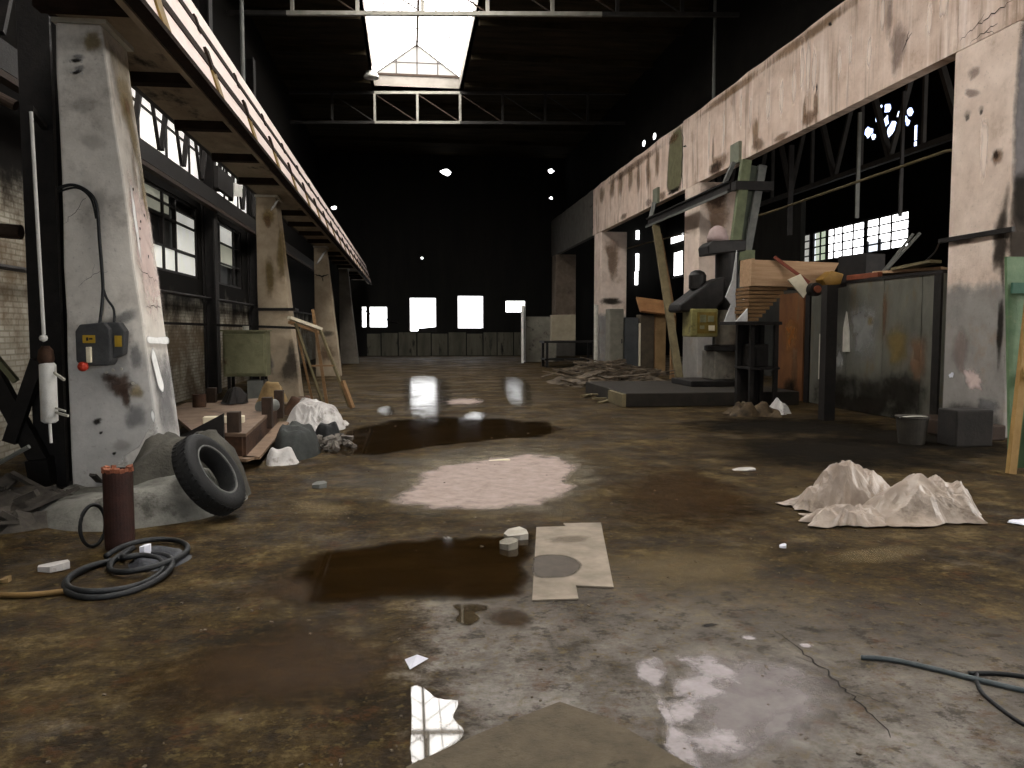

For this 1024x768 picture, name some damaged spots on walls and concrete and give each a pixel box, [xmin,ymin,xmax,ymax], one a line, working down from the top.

leakage [881,0,904,68]
crack [960,1,1010,42]
corrosion [103,368,142,405]
efflorescence [638,657,664,685]
efflorescence [658,656,812,767]
crack [774,630,891,738]